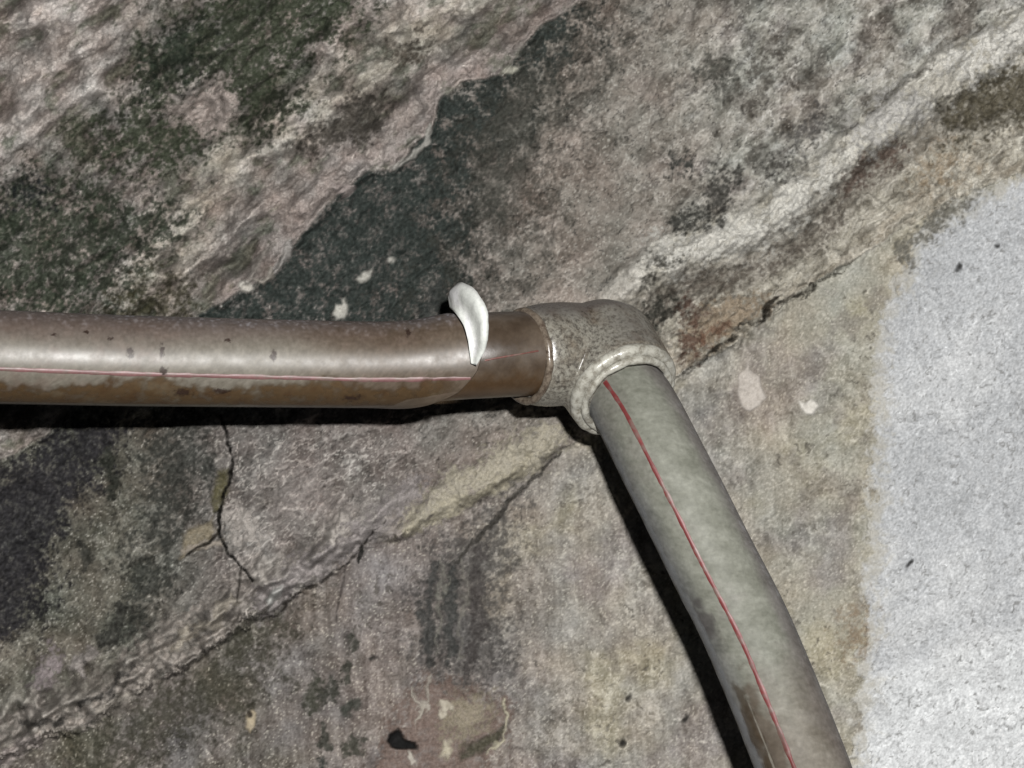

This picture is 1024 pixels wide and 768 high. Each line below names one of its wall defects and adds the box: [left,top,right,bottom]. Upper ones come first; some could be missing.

crack [701,273,842,364]
crack [186,415,254,597]